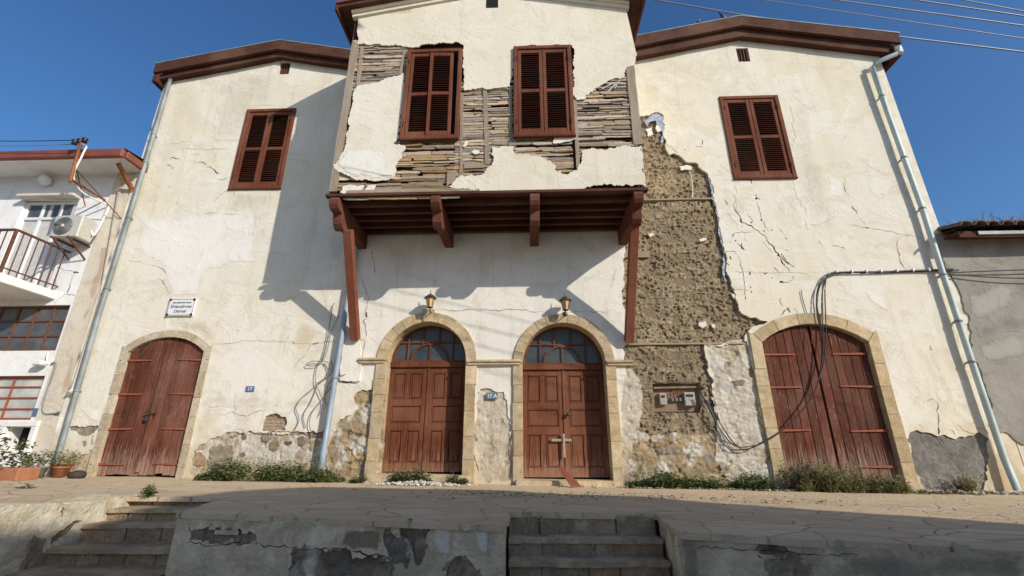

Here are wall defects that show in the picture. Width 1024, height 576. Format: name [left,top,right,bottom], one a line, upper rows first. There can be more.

peeling [338,148,393,193]
crack [725,181,822,315]
flaking render [620,113,773,488]
flaking render [189,389,386,480]
flaking render [474,388,513,483]
flaking render [907,430,988,491]
flaking render [188,524,257,548]
flaking render [288,519,430,576]
flaking render [442,555,482,576]